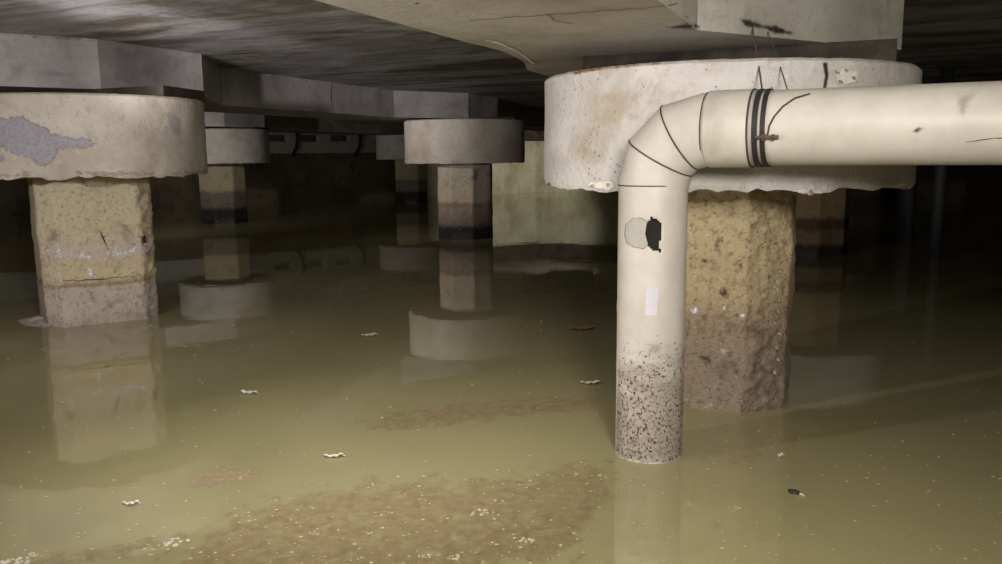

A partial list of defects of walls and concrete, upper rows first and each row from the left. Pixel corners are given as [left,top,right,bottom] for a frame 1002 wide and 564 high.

crack [470,3,678,24]
peeling [0,113,99,177]